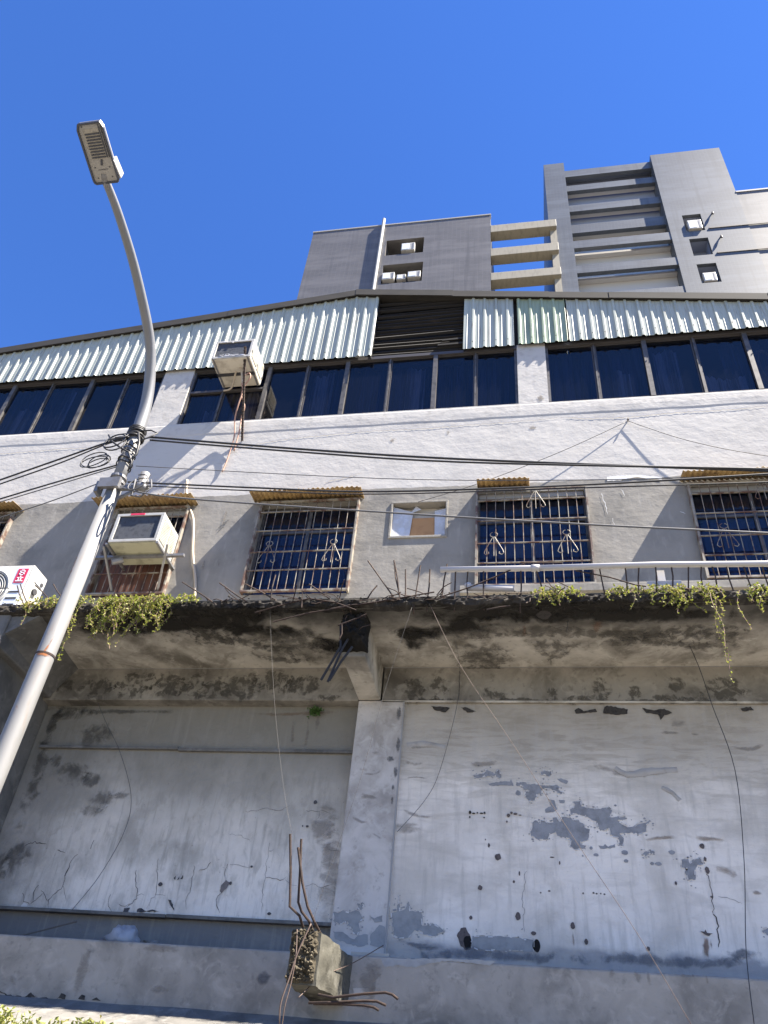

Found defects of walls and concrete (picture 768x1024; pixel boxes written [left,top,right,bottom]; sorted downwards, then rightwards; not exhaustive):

leakage [80,605,339,701]
leakage [398,599,748,669]
spalling [575,706,628,715]
spalling [643,708,672,720]
leakage [626,678,745,705]
peeling [472,765,654,863]
crack [23,841,93,903]
crack [108,808,329,913]
peeling [289,825,536,968]
peeling [641,843,710,888]
crack [706,874,741,947]
leakage [677,949,750,967]